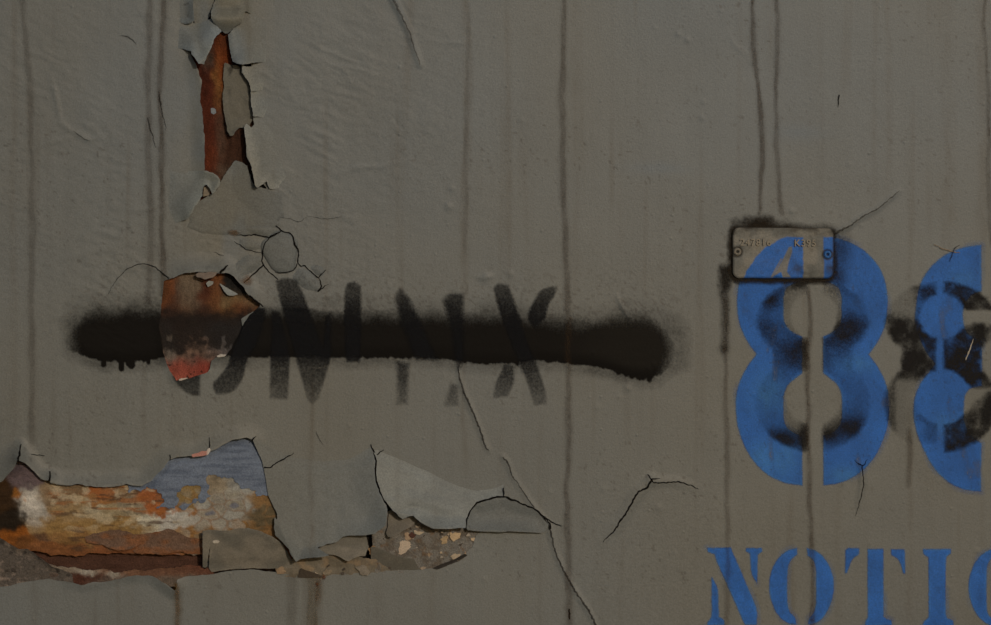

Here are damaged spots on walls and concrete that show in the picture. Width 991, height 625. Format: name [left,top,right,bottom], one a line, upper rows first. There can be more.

peeling [168,0,286,236]
rust [108,263,263,381]
rust [0,436,561,612]
crack [458,367,596,625]
crack [603,475,698,542]
crack [855,460,867,516]